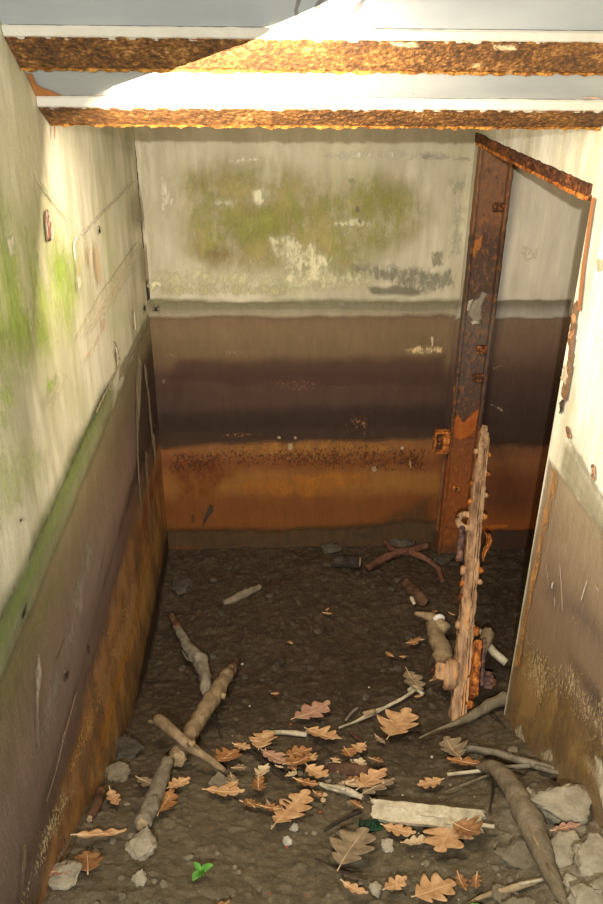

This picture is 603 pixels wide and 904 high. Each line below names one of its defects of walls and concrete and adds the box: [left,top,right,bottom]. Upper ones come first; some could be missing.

corrosion [49,124,601,139]
water stain [133,196,144,222]
corrosion [472,235,483,258]
corrosion [577,197,601,311]
corrosion [453,410,478,440]
corrosion [482,443,603,796]
corrosion [38,438,446,904]